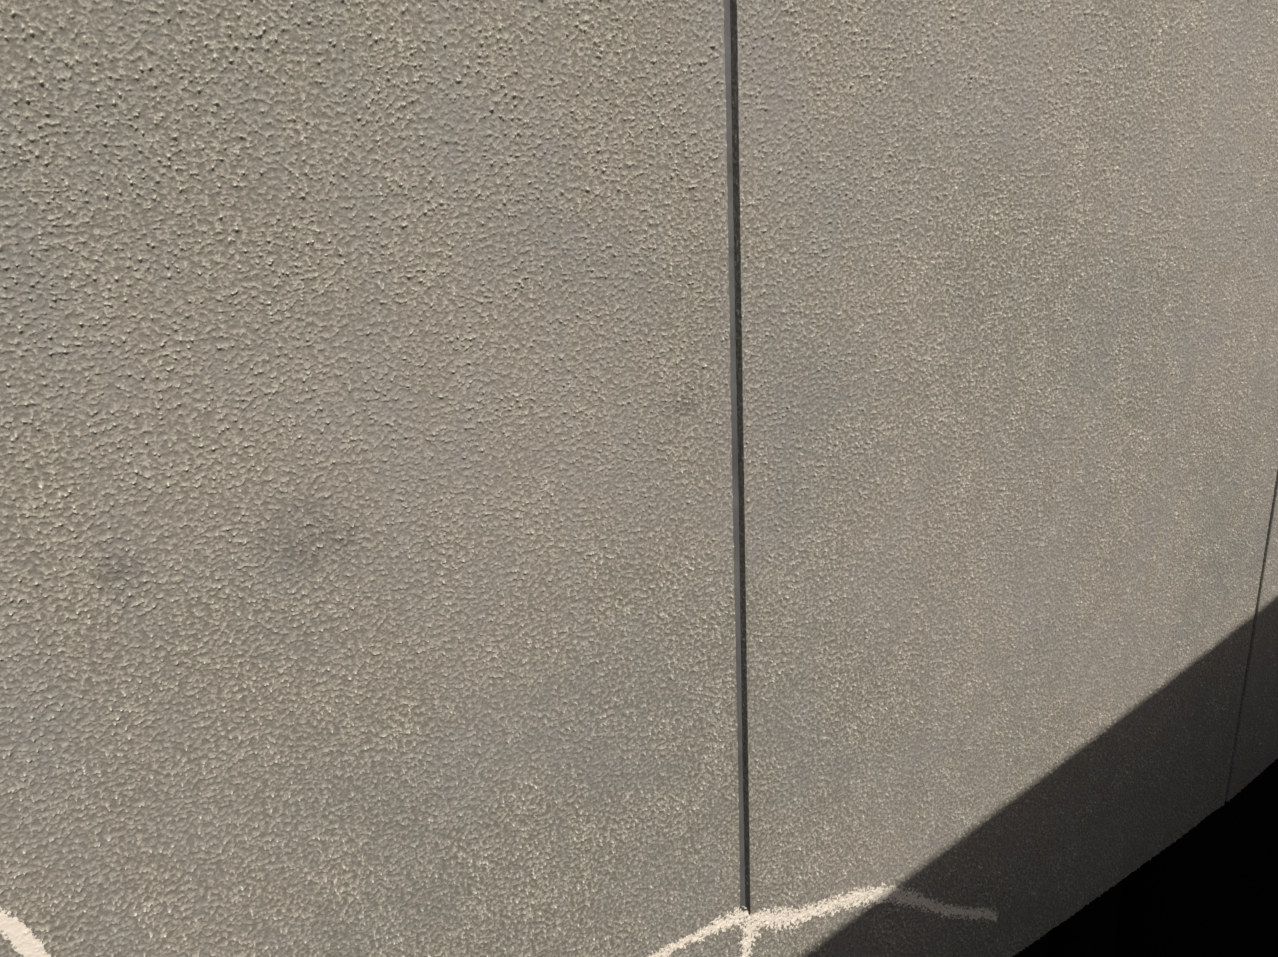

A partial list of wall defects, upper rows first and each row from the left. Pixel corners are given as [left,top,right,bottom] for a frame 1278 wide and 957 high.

crack [0,908,56,957]
crack [647,882,998,957]